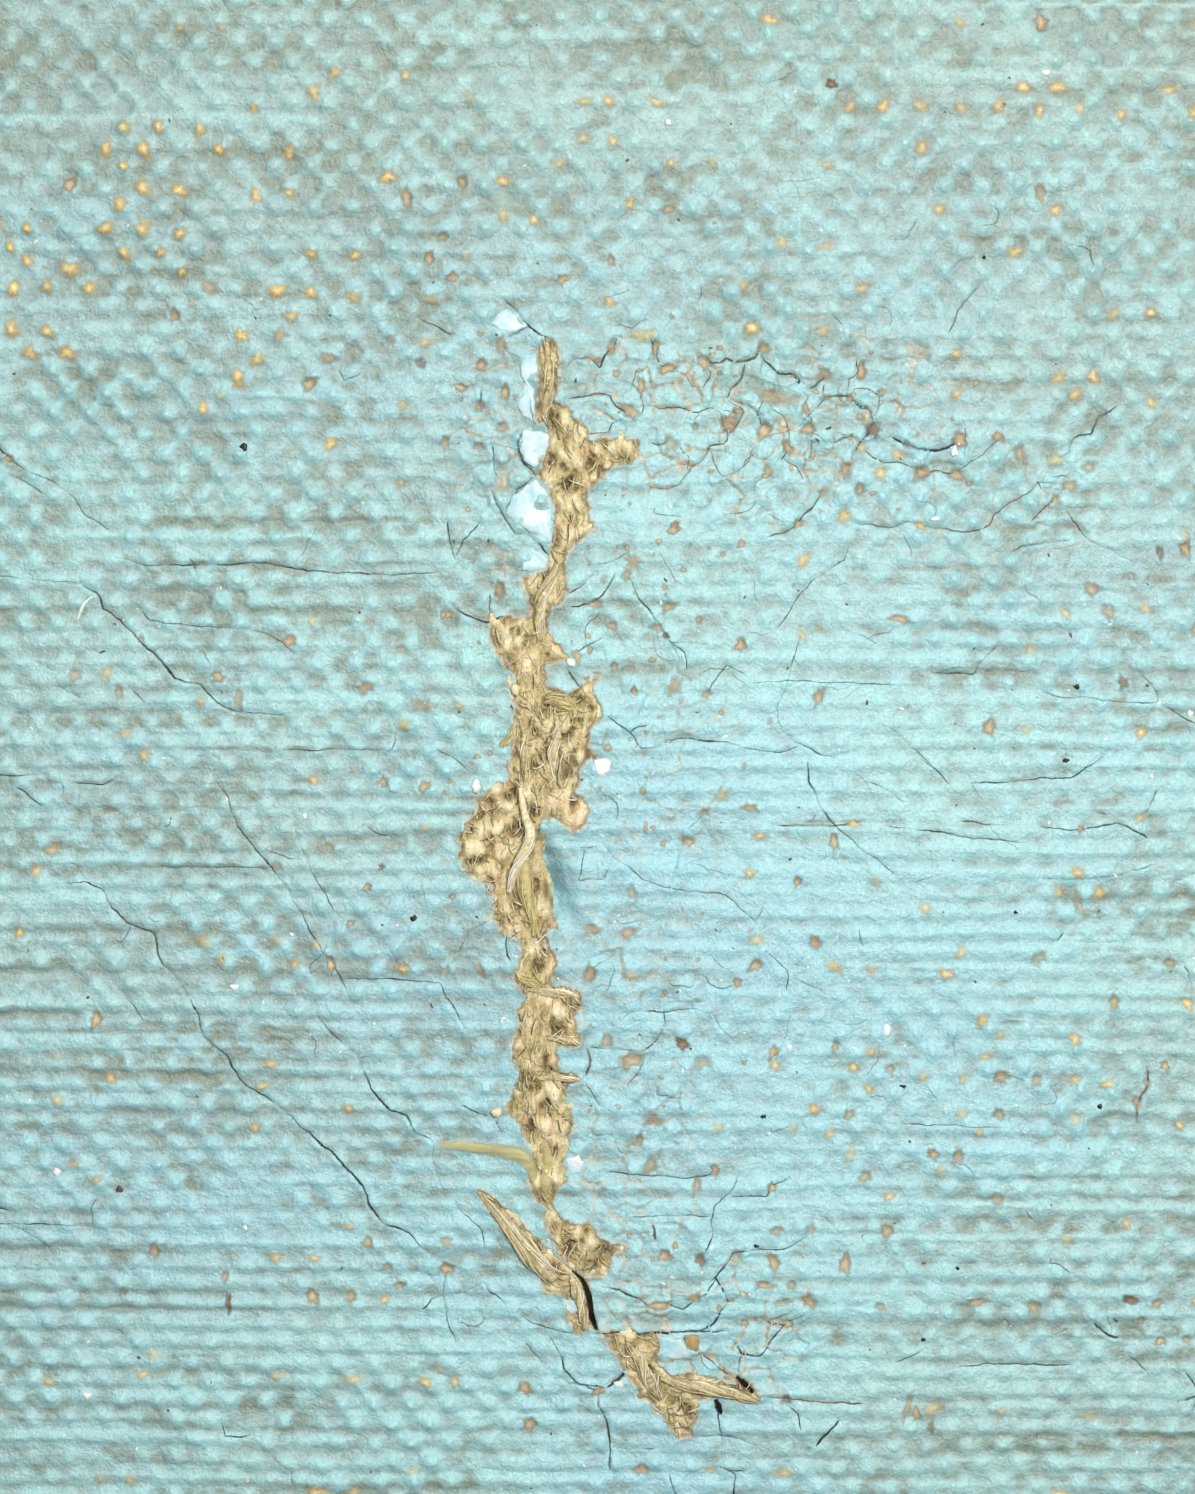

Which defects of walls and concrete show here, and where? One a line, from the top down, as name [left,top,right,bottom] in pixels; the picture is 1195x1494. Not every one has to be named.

peeling [478,309,527,336]
crack [568,332,1116,697]
crack [59,581,335,751]
crack [609,717,1008,841]
crack [77,881,164,965]
crack [304,877,461,1020]
peeling [451,337,762,1437]
crack [192,1003,271,1100]
crack [366,1076,431,1139]
crack [300,1126,426,1250]
crack [489,1159,793,1494]
crack [773,1396,862,1446]